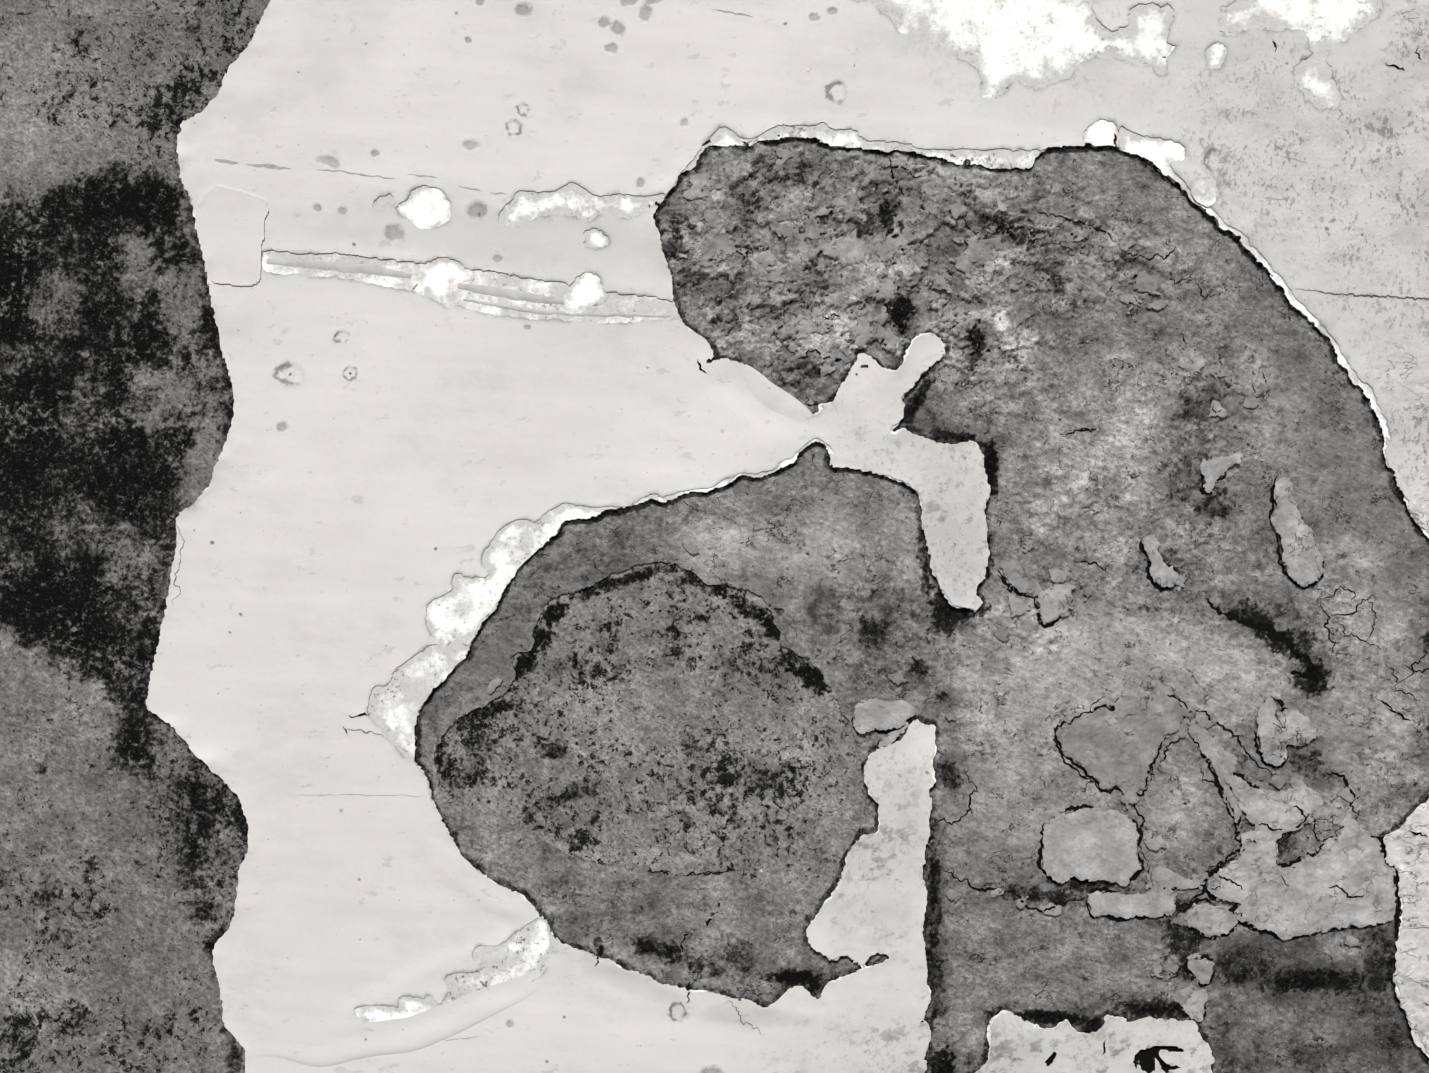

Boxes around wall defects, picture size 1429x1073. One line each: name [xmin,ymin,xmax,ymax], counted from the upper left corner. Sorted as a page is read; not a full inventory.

crack [1302,289,1429,300]
leakage [0,160,249,930]
peeling [0,0,270,1073]
leakage [513,562,835,704]
peeling [354,119,1429,1073]
crack [1205,586,1429,721]
leakage [435,698,526,798]
leakage [538,742,567,759]
leakage [552,777,599,808]
leakage [680,724,706,773]
leakage [753,769,783,800]
crack [1054,692,1429,939]